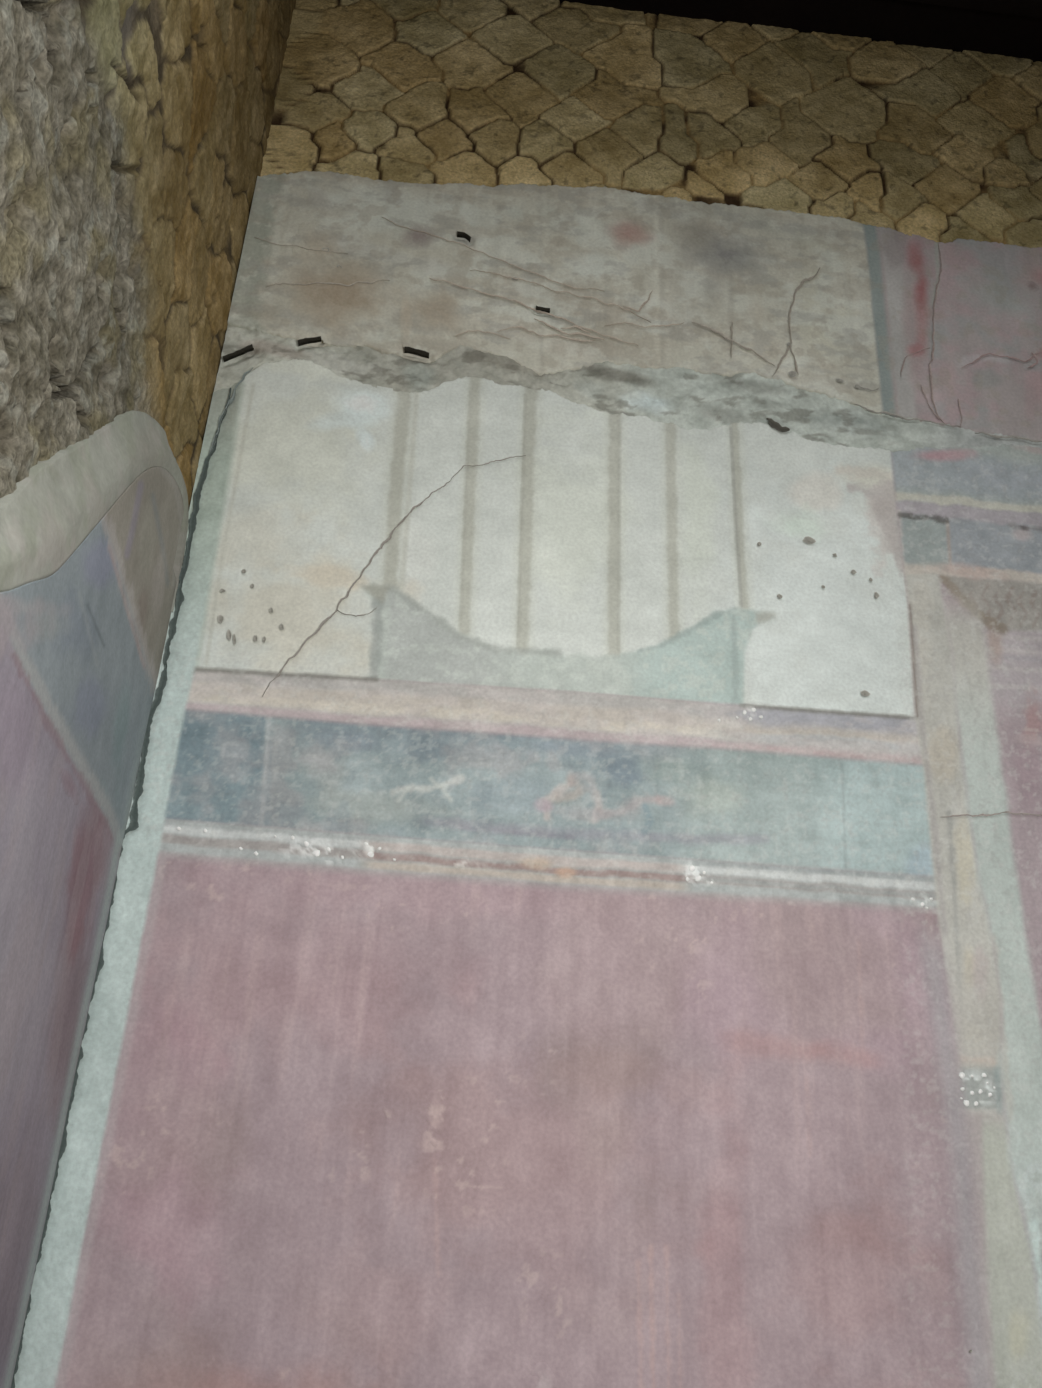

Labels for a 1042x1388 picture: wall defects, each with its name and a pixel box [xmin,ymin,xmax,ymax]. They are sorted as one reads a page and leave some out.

crack [382,217,820,377]
flaking render [214,325,1042,452]
crack [767,418,790,432]
crack [855,243,1042,442]
crack [262,455,526,697]
crack [945,810,1042,818]
leakage [958,1066,1001,1109]